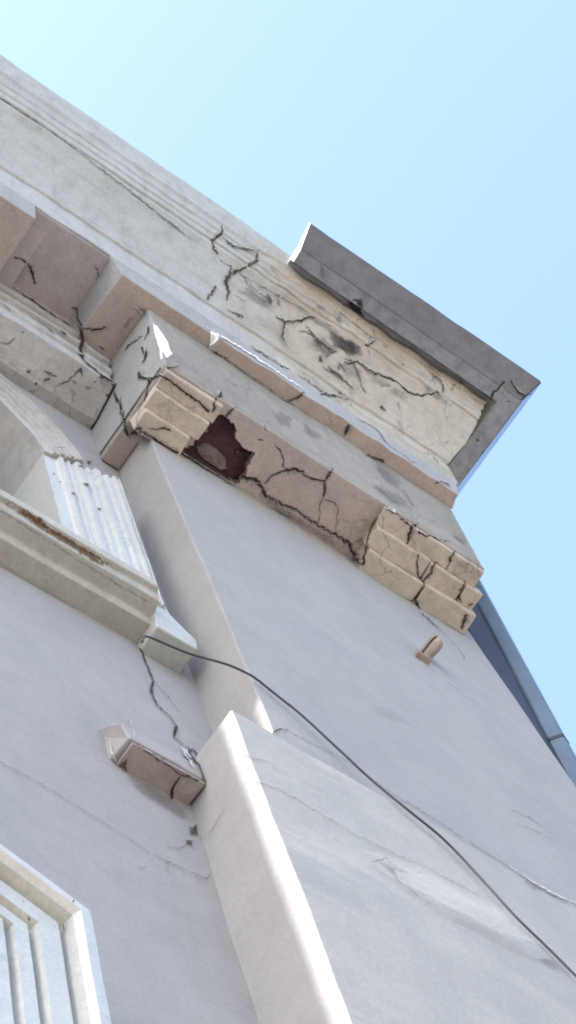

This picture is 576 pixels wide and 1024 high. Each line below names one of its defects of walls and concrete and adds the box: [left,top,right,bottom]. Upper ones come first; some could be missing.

flaking render [184,415,252,480]
crack [0,98,445,463]
crack [60,307,463,655]
crack [139,647,205,799]